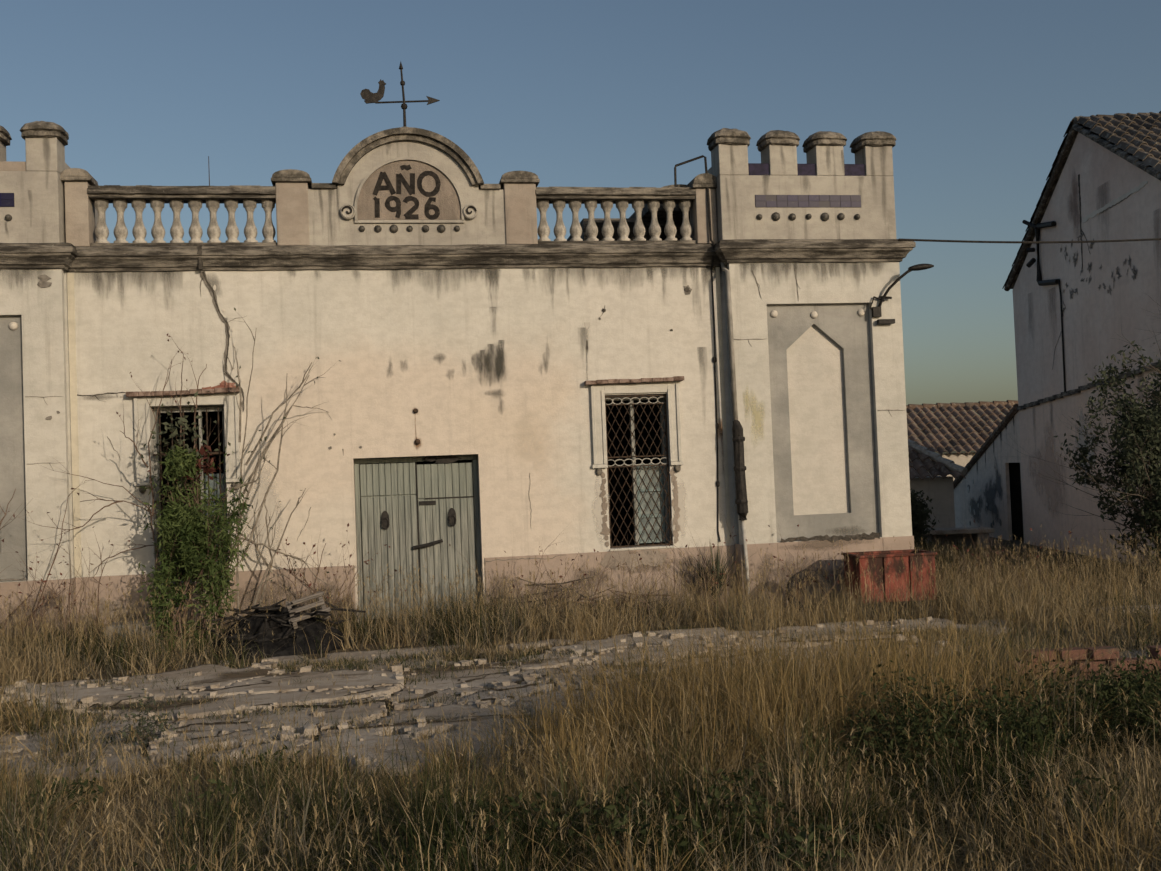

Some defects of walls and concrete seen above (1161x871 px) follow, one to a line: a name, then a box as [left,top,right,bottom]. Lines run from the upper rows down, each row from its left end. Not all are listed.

water stain [477,340,504,407]
crack [56,668,566,740]